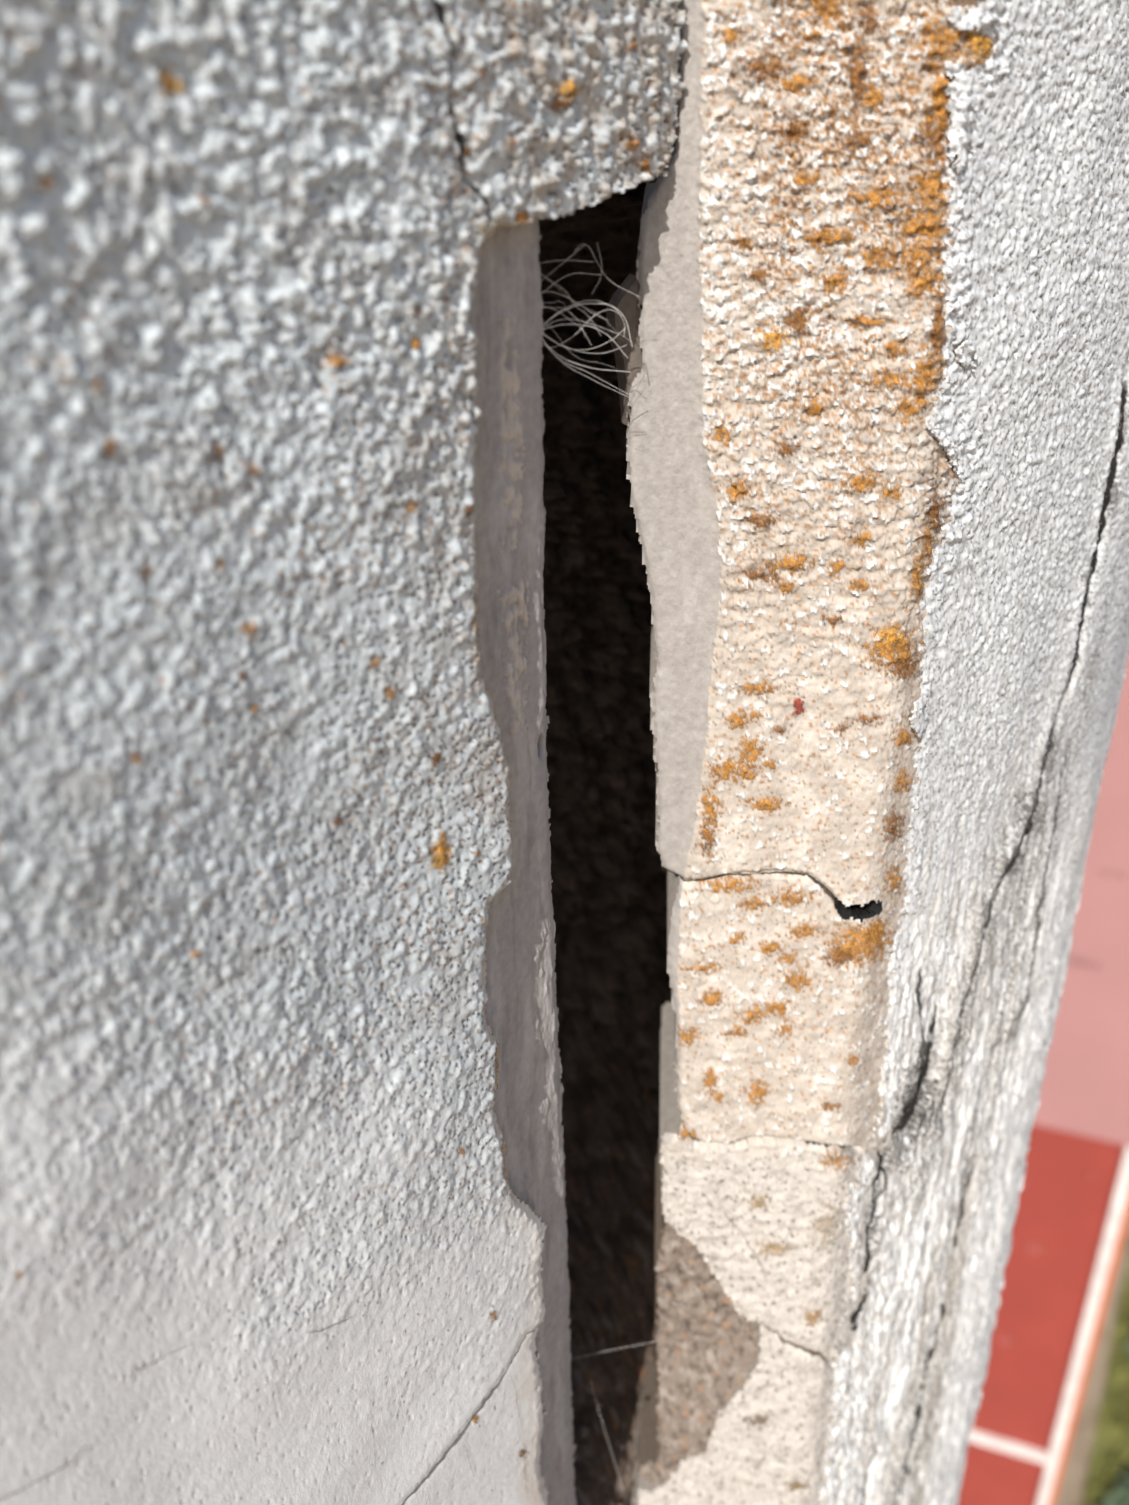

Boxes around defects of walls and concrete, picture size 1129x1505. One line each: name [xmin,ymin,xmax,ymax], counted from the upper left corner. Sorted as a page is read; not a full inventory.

rust [773,0,889,152]
rust [804,17,997,428]
rust [738,551,870,596]
crack [1067,386,1128,687]
crack [402,0,836,1505]
rust [699,680,804,857]
rust [699,875,814,910]
rust [720,919,898,1039]
crack [794,738,1068,1331]
damp [907,676,1093,1135]
spalling [638,1145,758,1484]
crack [862,1169,974,1505]